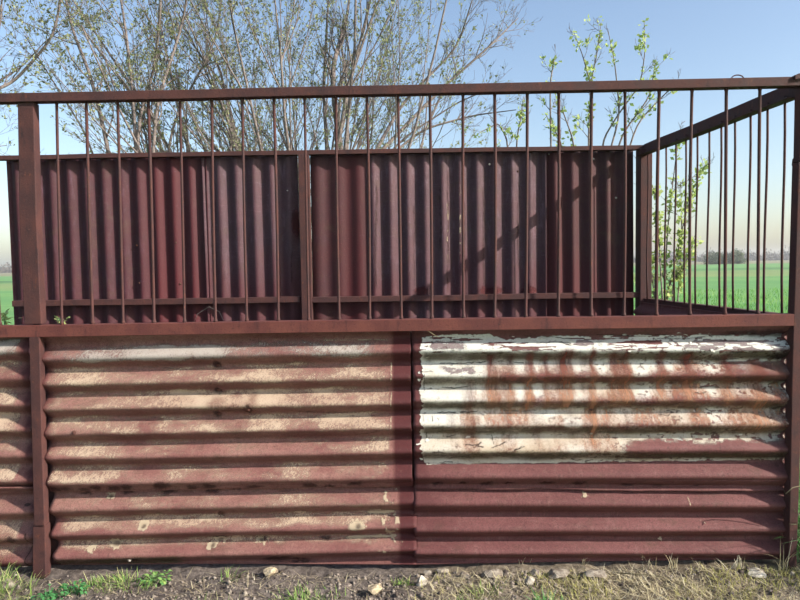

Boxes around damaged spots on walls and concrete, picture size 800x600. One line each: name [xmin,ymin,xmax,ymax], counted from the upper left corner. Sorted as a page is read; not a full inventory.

peeling [416,332,790,465]
corrosion [463,350,789,454]